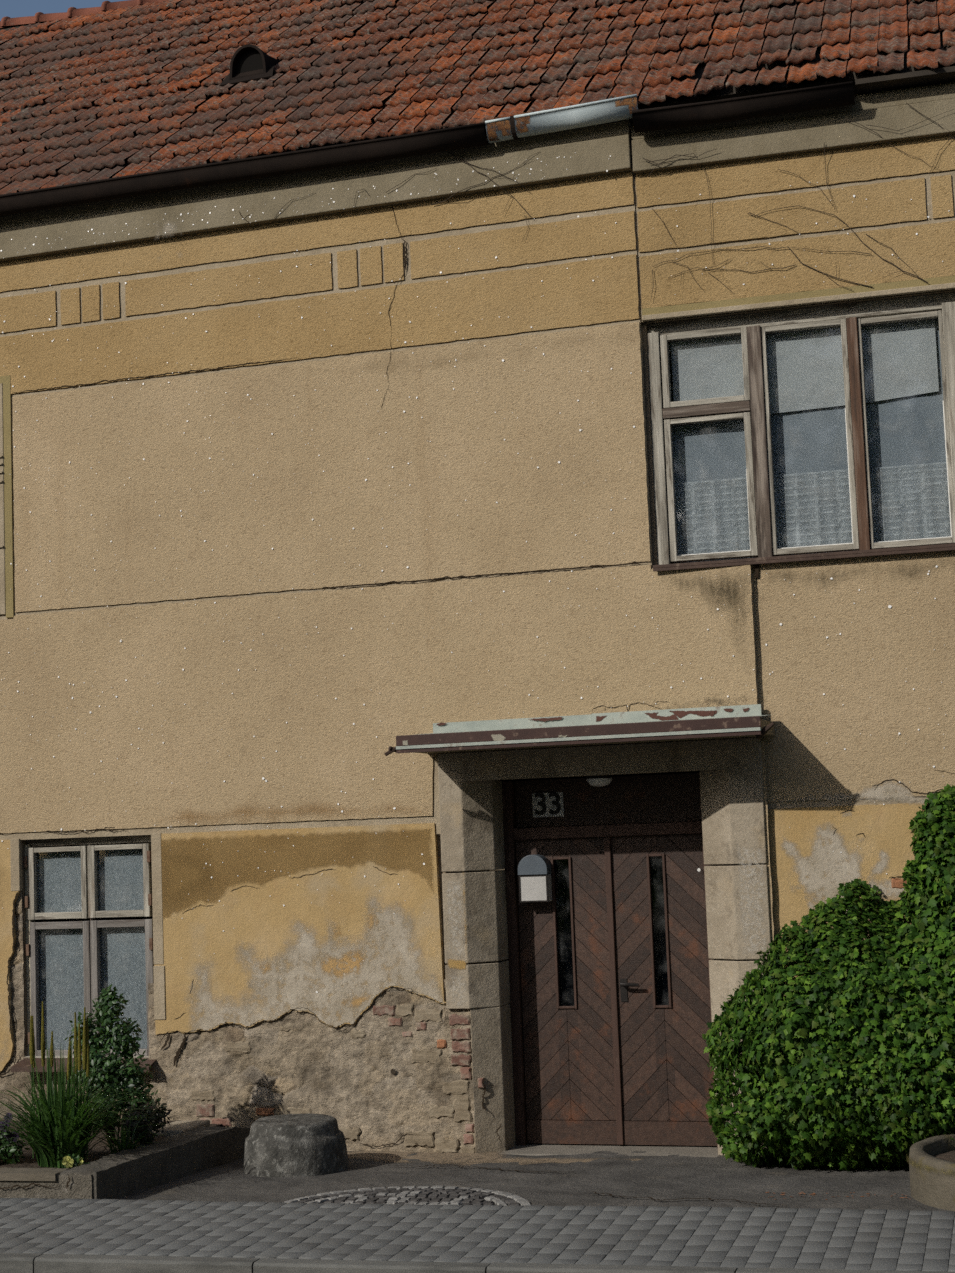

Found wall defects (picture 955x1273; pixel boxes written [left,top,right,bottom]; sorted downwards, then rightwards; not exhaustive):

crack [381,207,407,410]
rust [645,708,749,721]
peeling [802,782,925,816]
peeling [161,830,432,917]
peeling [783,826,916,930]
spalling [0,891,90,1121]
spalling [114,898,485,1153]